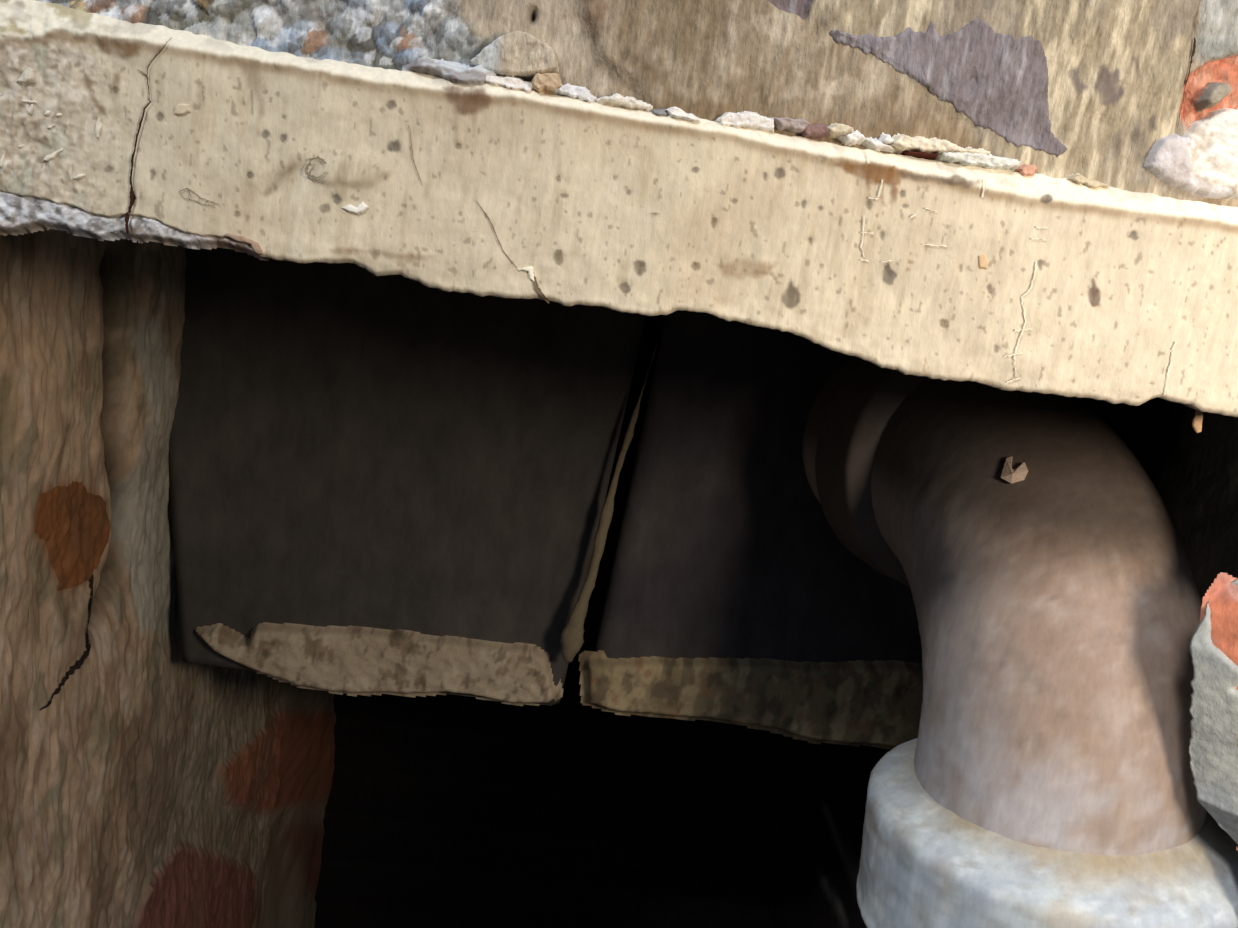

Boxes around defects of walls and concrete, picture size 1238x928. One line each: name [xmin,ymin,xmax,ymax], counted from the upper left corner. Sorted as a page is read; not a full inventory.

spalling [0,191,270,261]
crack [125,40,169,233]
crack [475,199,550,303]
spalling [486,73,700,123]
spalling [715,111,1037,198]
peeling [860,180,896,283]
spalling [1062,173,1109,189]
flaking render [1183,56,1238,128]
crack [40,575,94,710]
flaking render [1200,572,1238,666]